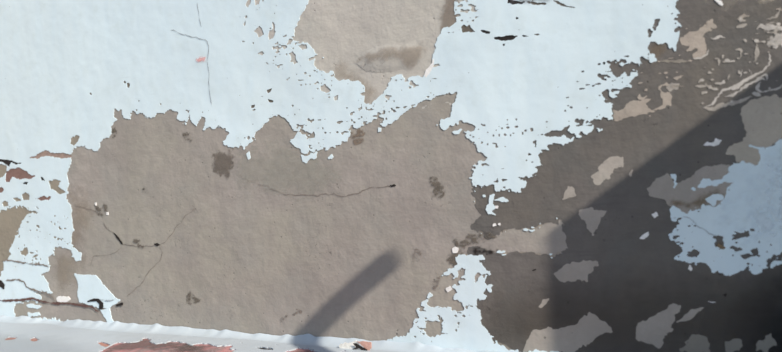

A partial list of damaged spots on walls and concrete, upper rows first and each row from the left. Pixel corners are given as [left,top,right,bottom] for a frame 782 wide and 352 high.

crack [174,4,211,99]
peeling [272,0,479,115]
crack [0,204,194,312]
peeling [0,92,568,341]
crack [240,175,396,197]
peeling [467,0,782,352]
damp [768,311,782,352]